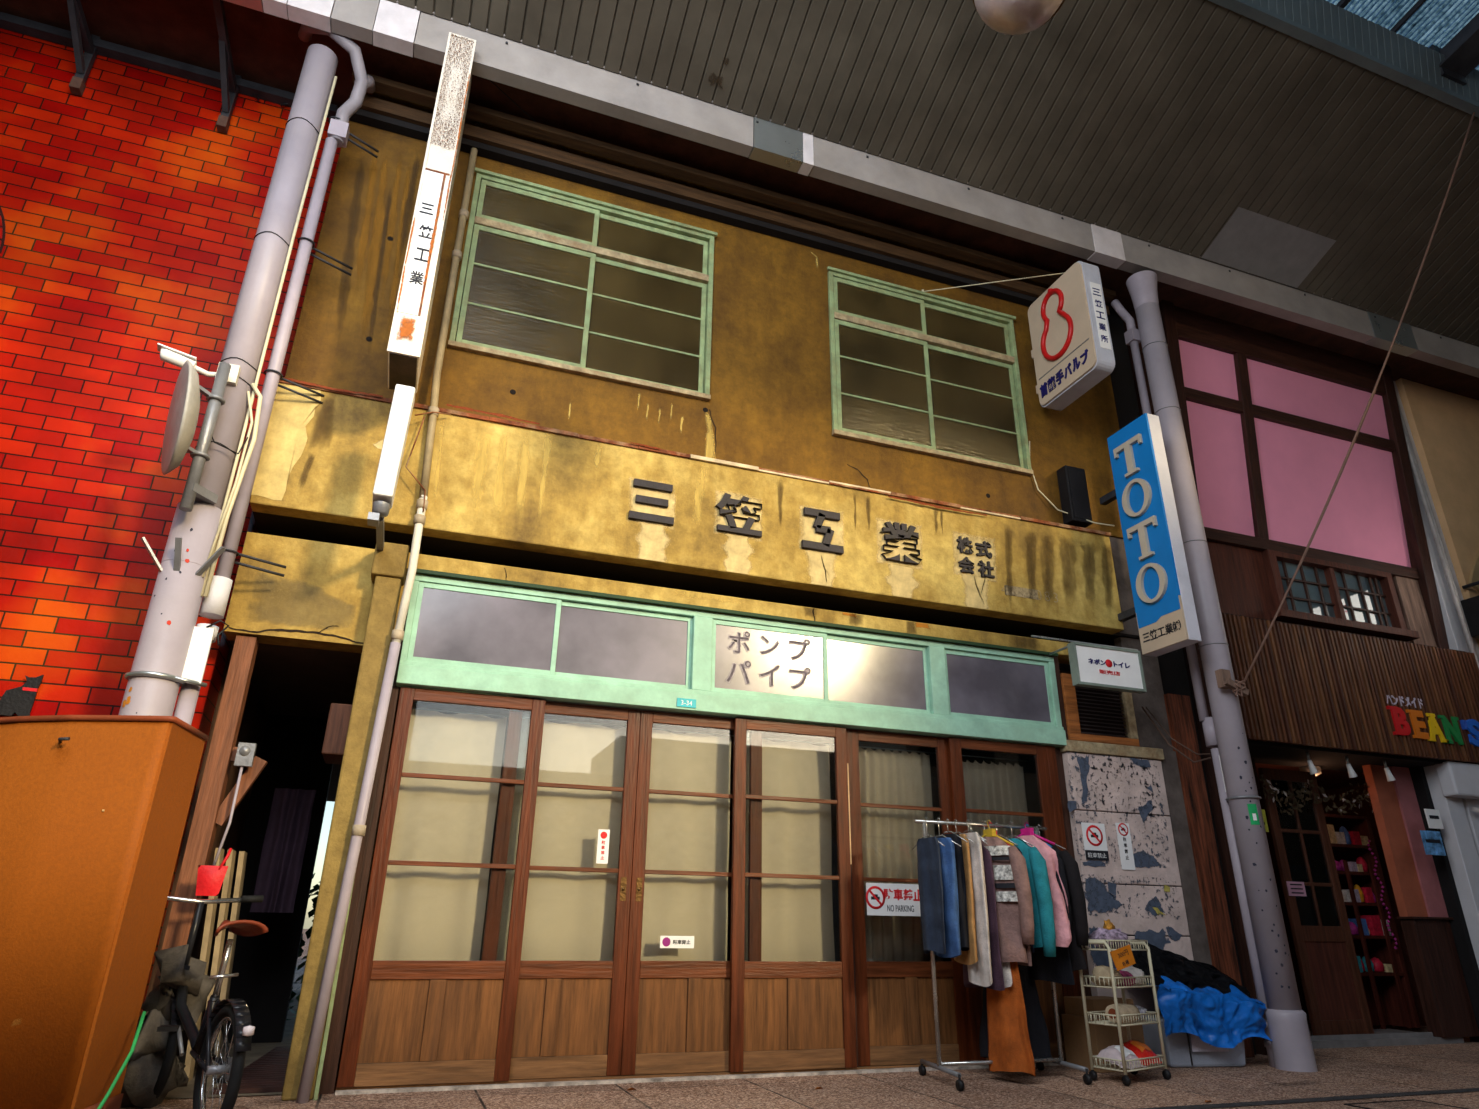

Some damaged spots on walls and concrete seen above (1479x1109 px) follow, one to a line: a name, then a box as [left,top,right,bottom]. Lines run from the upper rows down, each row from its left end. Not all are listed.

damp [475,439,550,504]
damp [695,416,713,517]
damp [638,521,668,562]
damp [686,591,728,601]
damp [724,534,753,574]
damp [807,549,836,587]
damp [887,564,918,598]
damp [962,574,988,609]
damp [1028,537,1110,594]
peeling [1066,751,1182,969]